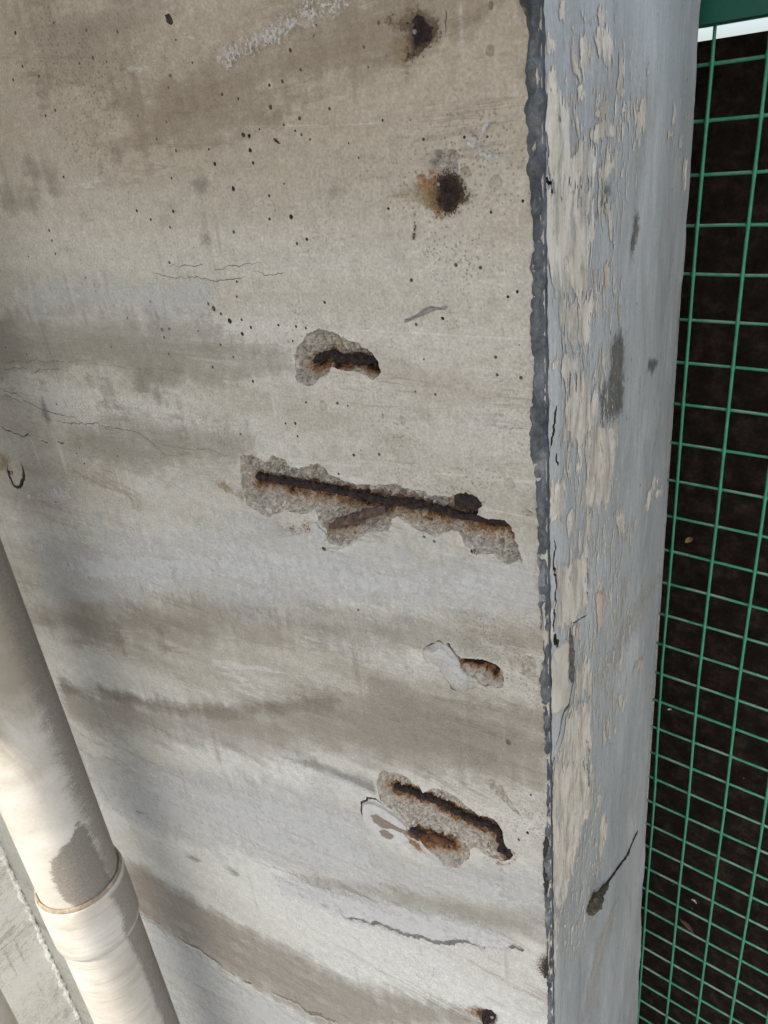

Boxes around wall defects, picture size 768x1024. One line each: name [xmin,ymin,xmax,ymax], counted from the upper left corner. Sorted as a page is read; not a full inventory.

peeling [668,101,688,191]
corrosion [414,166,473,218]
spalling [294,329,381,386]
spalling [221,454,523,564]
peeling [536,0,662,978]
spalling [447,642,504,688]
spalling [362,770,515,868]
crack [335,905,524,952]